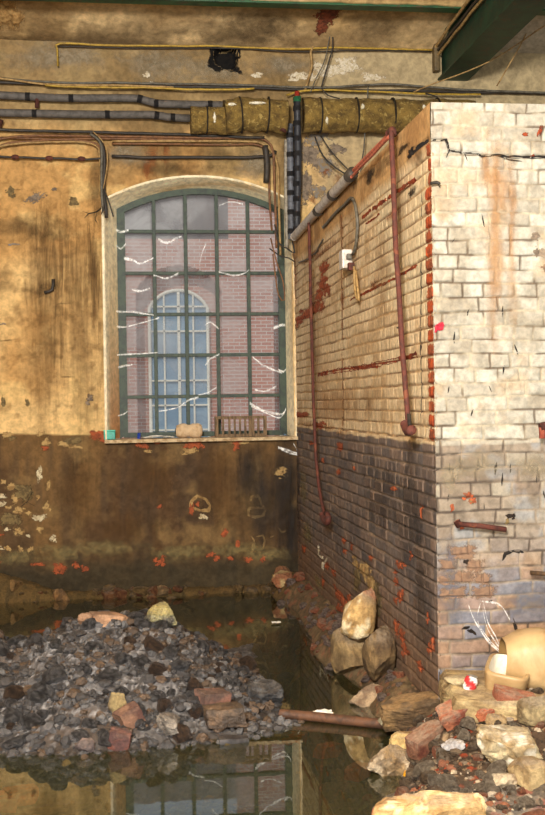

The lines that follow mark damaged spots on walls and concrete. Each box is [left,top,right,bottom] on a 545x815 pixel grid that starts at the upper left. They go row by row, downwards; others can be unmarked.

spalling [207,49,263,78]
peeling [288,57,386,82]
crack [407,139,545,162]
peeling [5,186,57,204]
peeling [295,259,330,329]
rust [318,265,418,431]
peeling [0,465,57,553]
peeling [30,561,90,575]